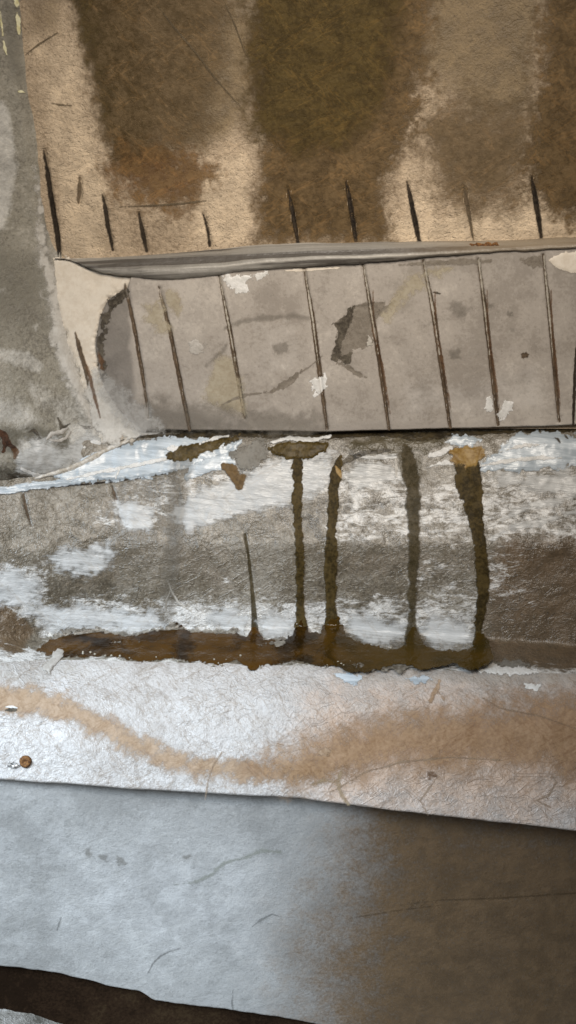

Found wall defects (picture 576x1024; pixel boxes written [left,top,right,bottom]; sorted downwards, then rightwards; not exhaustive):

crack [43,150,211,257]
leakage [71,0,224,217]
crack [287,190,299,243]
spalling [227,302,391,403]
crack [345,181,390,430]
leakage [248,0,576,244]
crack [406,181,452,429]
crack [531,176,576,426]
leakage [66,429,576,646]